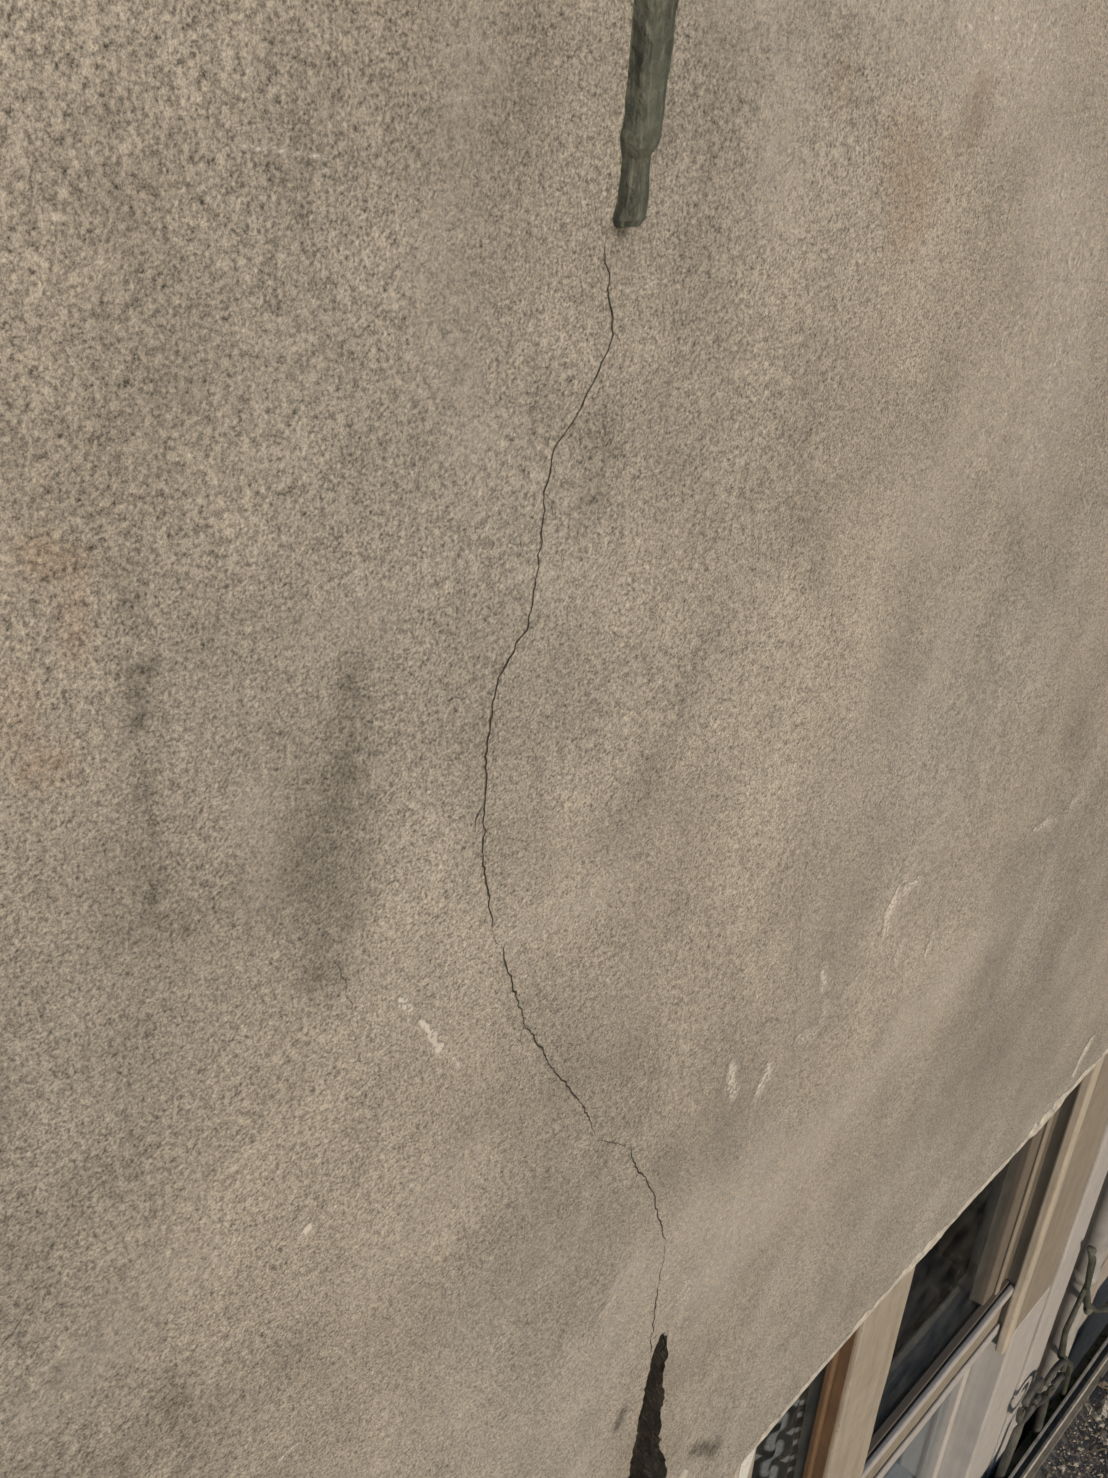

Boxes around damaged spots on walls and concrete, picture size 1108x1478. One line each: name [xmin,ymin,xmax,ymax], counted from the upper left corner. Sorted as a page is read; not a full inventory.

crack [475,233,666,1356]